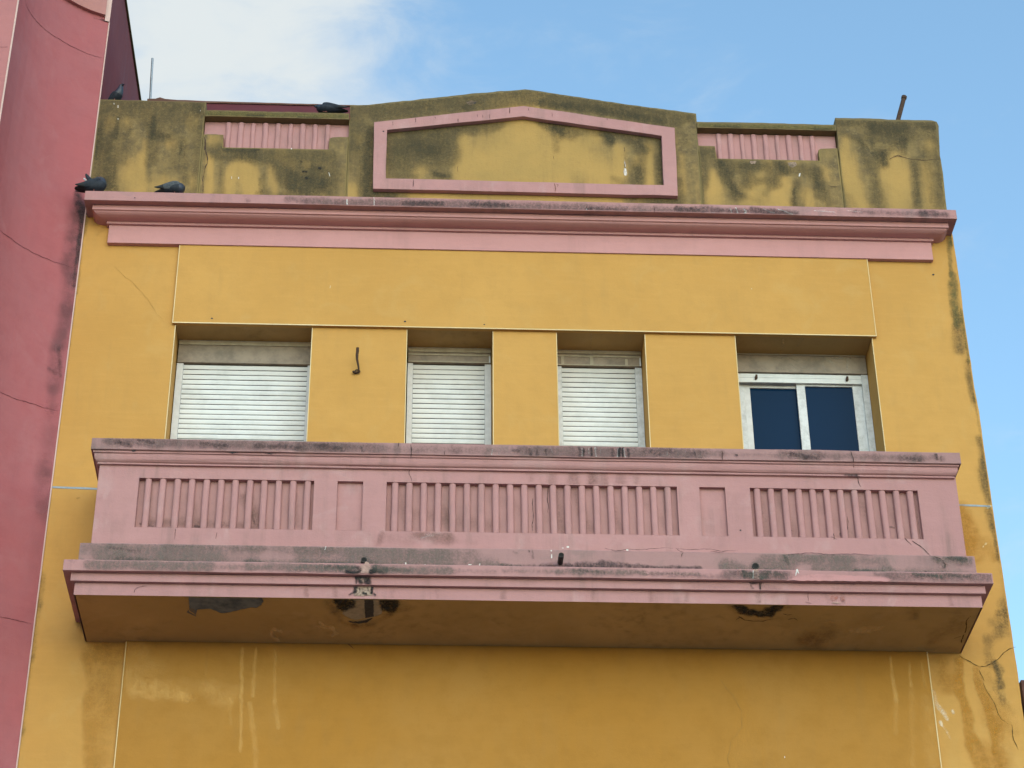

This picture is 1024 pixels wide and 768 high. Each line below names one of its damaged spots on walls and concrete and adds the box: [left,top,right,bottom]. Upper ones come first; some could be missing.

leakage [97,91,932,214]
leakage [76,193,85,264]
leakage [950,260,961,350]
leakage [94,543,226,562]
spalling [186,597,267,616]
leakage [278,547,512,612]
leakage [540,560,701,575]
leakage [734,605,783,617]
leakage [721,554,896,590]
leakage [943,507,975,563]
crack [960,616,1018,748]